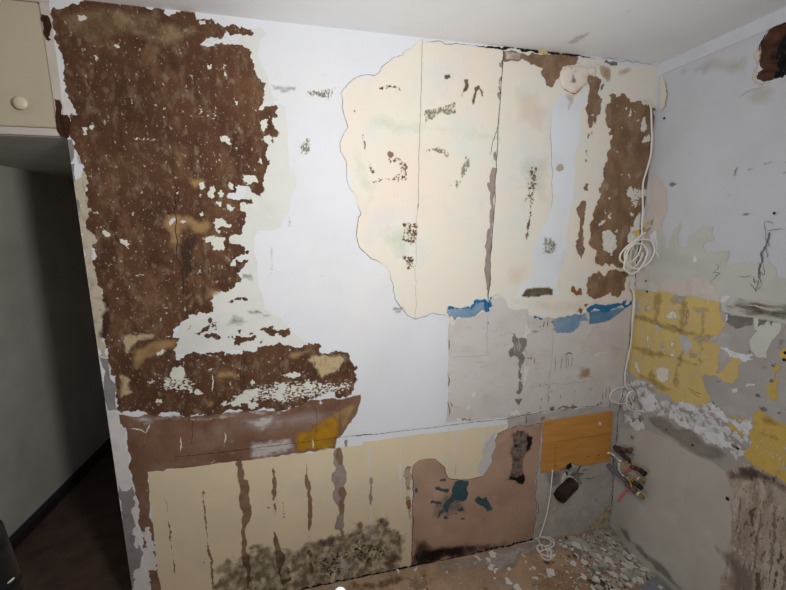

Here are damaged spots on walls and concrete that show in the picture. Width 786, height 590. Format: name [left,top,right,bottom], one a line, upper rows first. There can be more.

spalling [753,22,786,83]
peeling [50,0,361,590]
peeling [340,40,786,549]
leakage [509,431,532,484]
leakage [202,439,401,590]
leakage [415,544,474,563]
peeling [474,550,522,590]
leakage [636,546,670,578]
leakage [730,498,786,590]